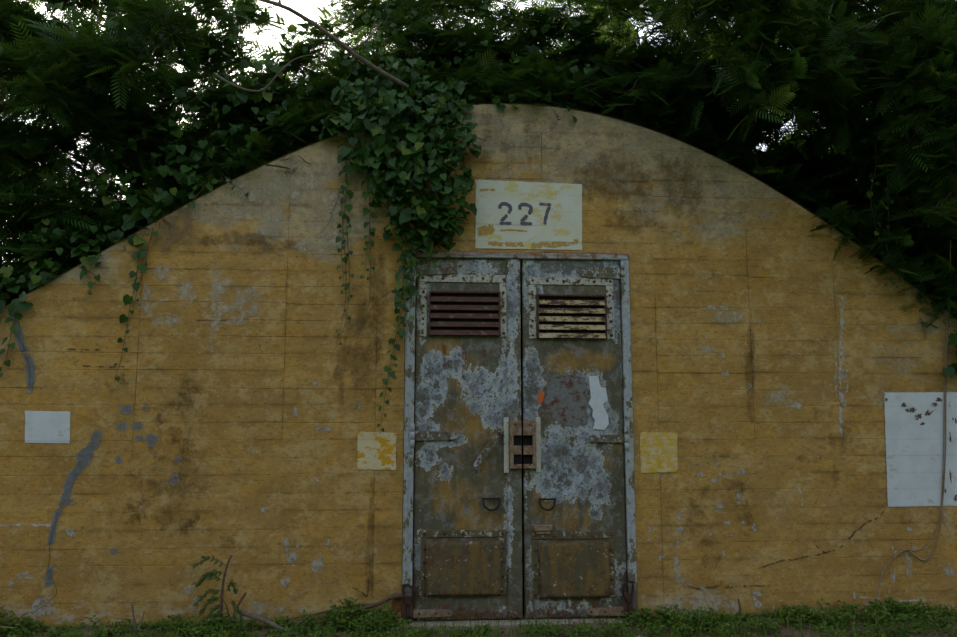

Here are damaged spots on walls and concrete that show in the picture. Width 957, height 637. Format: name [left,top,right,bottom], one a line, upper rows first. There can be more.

crack [8,313,36,394]
spalling [115,403,158,447]
crack [25,430,102,615]
crack [691,510,884,590]